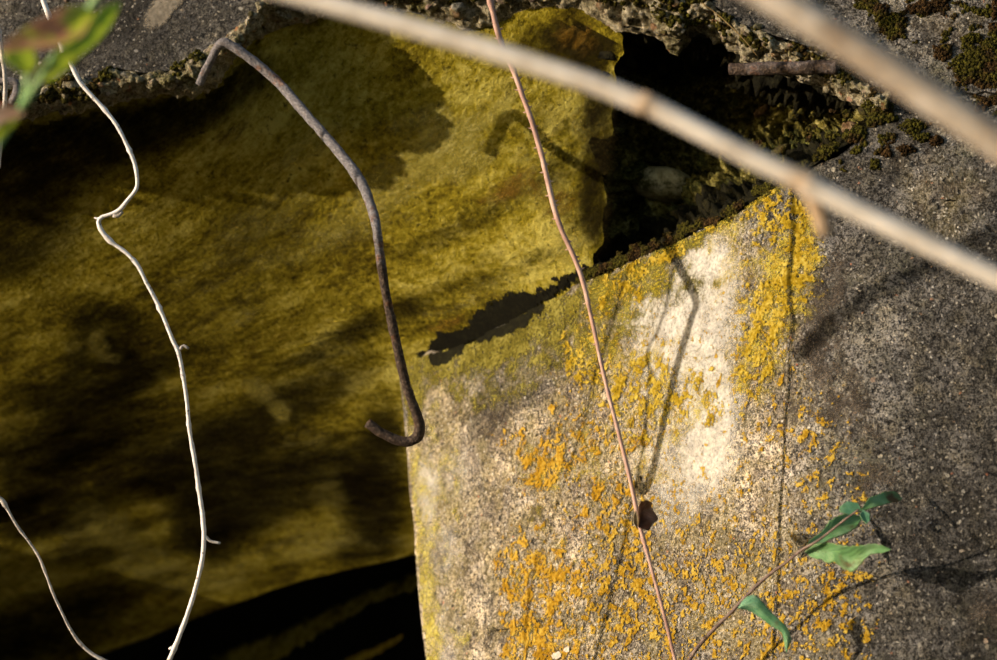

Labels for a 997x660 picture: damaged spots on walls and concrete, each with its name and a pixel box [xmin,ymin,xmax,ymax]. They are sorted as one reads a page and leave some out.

leakage [0,63,266,277]
spalling [0,0,425,447]
spalling [354,0,891,171]
spalling [582,103,780,277]
leakage [0,296,424,562]
leakage [0,583,129,660]